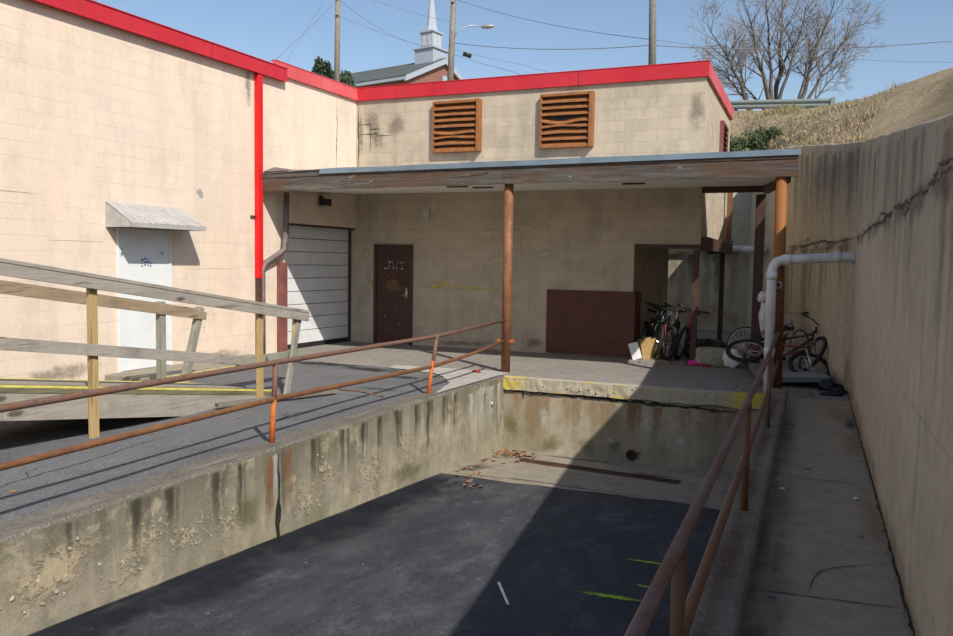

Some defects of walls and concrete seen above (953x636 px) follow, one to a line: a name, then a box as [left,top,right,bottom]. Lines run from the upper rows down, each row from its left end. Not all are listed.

crack [789,157,953,250]
damp [362,416,382,441]
damp [415,394,458,436]
damp [470,384,500,427]
damp [132,495,150,537]
damp [165,487,174,511]
damp [213,470,225,492]
crack [268,451,290,537]
spalling [0,499,250,614]